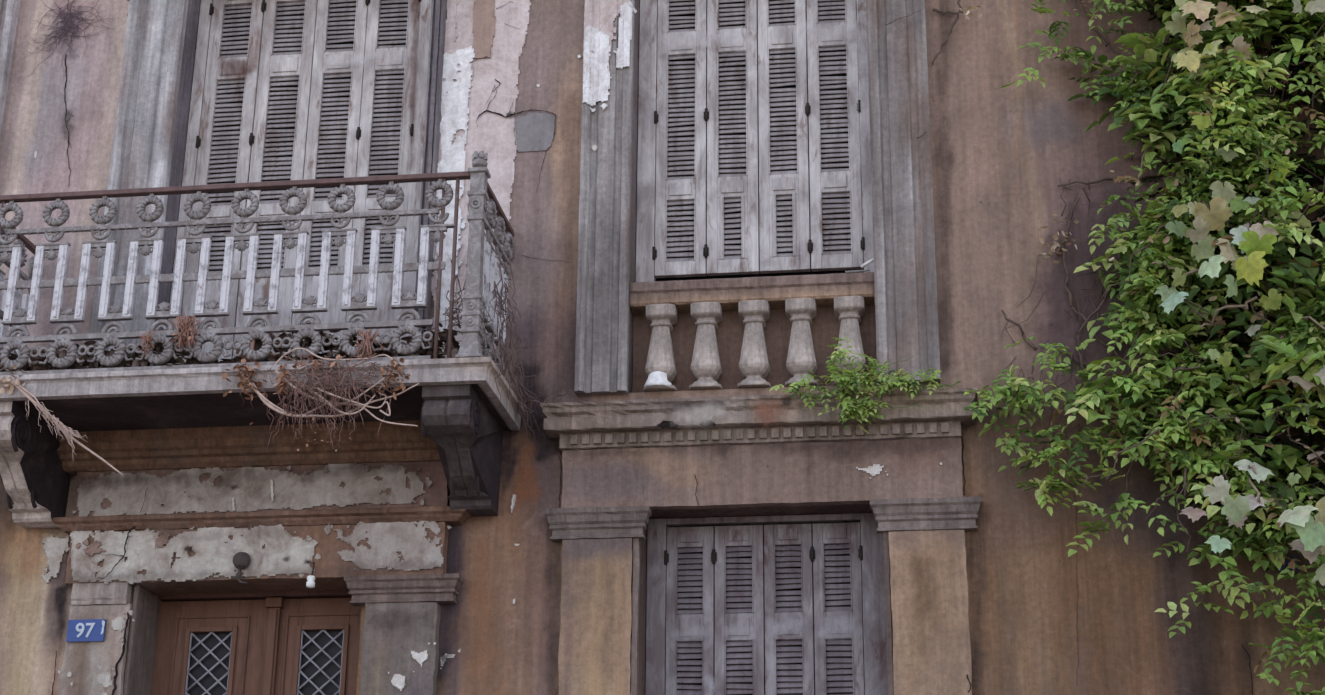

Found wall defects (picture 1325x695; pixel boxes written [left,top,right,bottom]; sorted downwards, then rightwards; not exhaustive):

peeling [577,0,637,113]
crack [64,54,73,187]
peeling [431,0,531,358]
peeling [41,463,452,585]
peeling [856,464,888,479]
peeling [58,666,115,695]
peeling [111,610,135,643]
peeling [388,642,461,691]